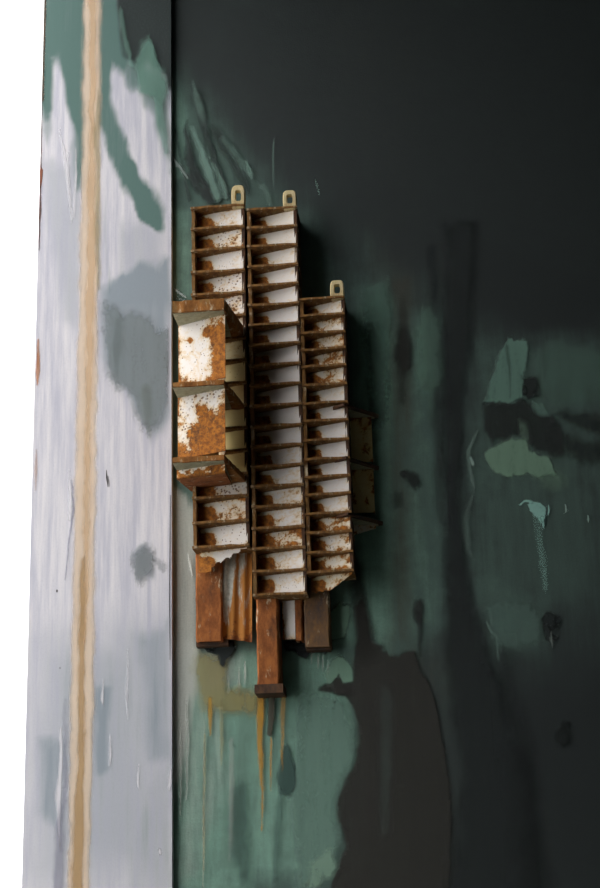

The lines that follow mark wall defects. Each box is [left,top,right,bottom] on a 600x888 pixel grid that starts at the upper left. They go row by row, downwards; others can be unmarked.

damp [103,302,168,427]
damp [135,547,154,580]
damp [276,222,600,888]
damp [204,641,236,667]
rust [196,655,285,830]